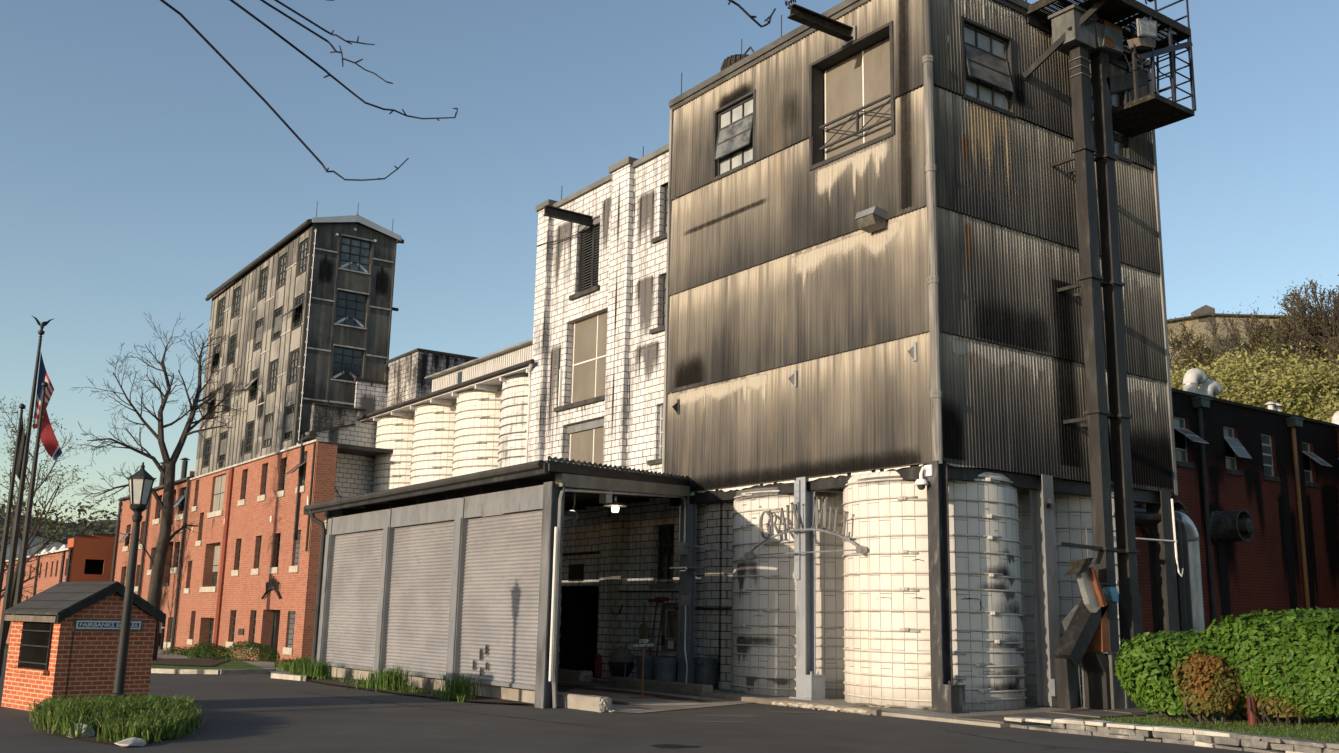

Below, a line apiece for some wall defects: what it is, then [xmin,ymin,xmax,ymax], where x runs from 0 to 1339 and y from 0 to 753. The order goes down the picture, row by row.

damp [603,191,654,247]
damp [792,0,912,287]
damp [942,405,964,460]
damp [952,279,1079,467]
damp [1127,377,1339,613]